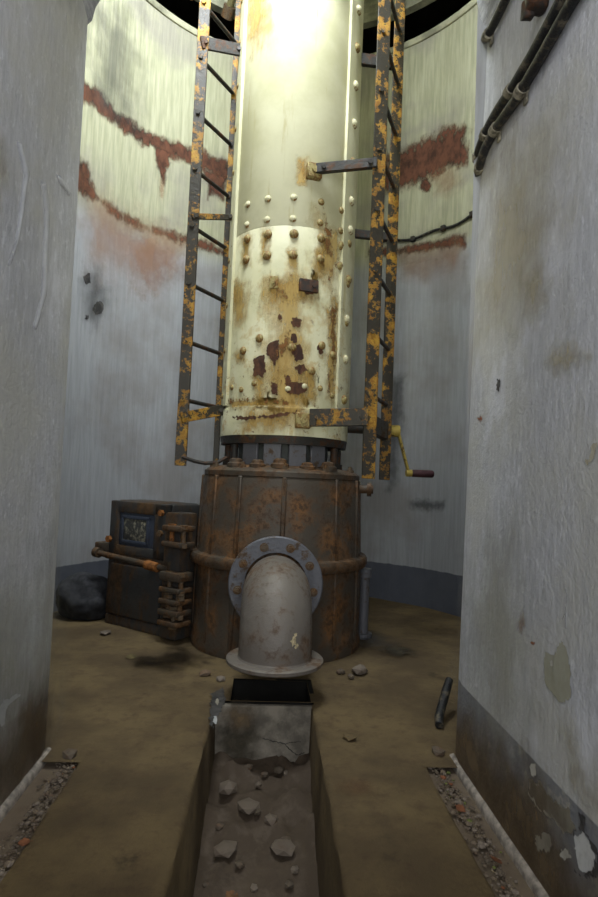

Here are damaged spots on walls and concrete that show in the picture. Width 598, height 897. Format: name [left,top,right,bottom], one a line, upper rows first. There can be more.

rust [83,81,191,184]
rust [202,149,228,201]
rust [385,124,469,193]
peeling [544,641,571,703]
peeling [528,763,598,879]